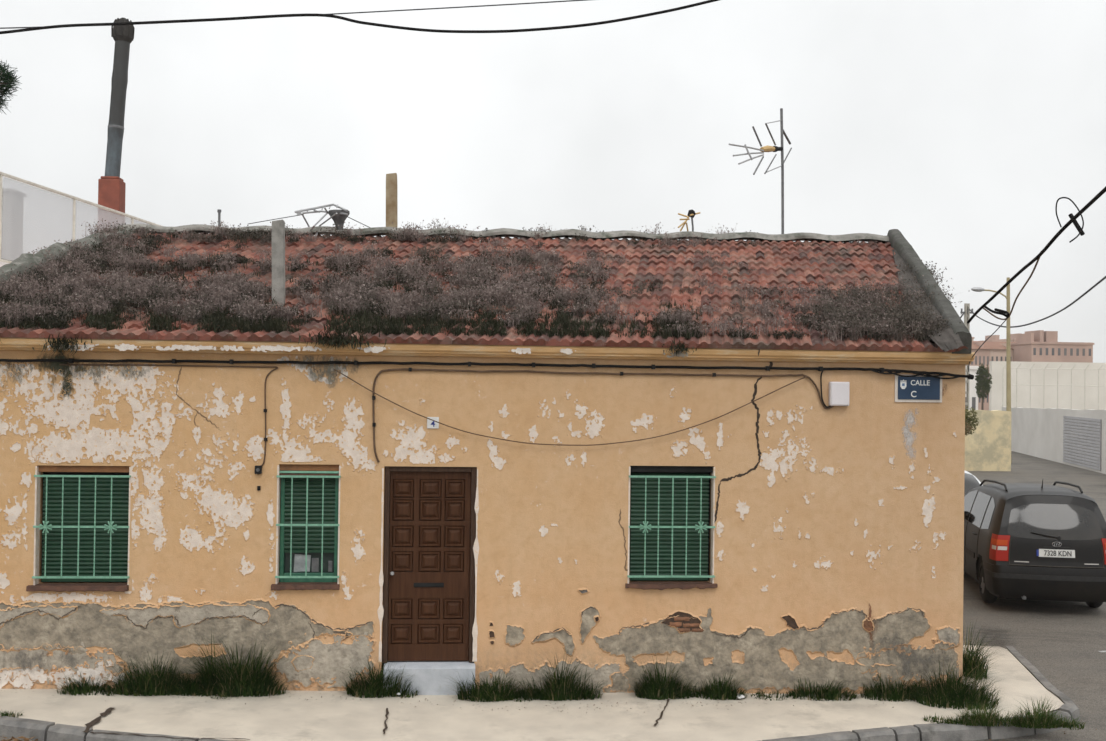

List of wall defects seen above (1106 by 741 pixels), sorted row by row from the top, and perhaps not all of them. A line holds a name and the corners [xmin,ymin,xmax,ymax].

peeling [0,343,469,577]
peeling [486,403,513,471]
peeling [527,389,606,468]
peeling [630,412,657,434]
peeling [669,386,732,464]
peeling [734,499,750,521]
crack [714,349,773,523]
peeling [759,403,844,488]
peeling [893,446,947,553]
peeling [340,528,367,601]
flaking render [0,571,377,691]
flaking render [478,588,962,693]